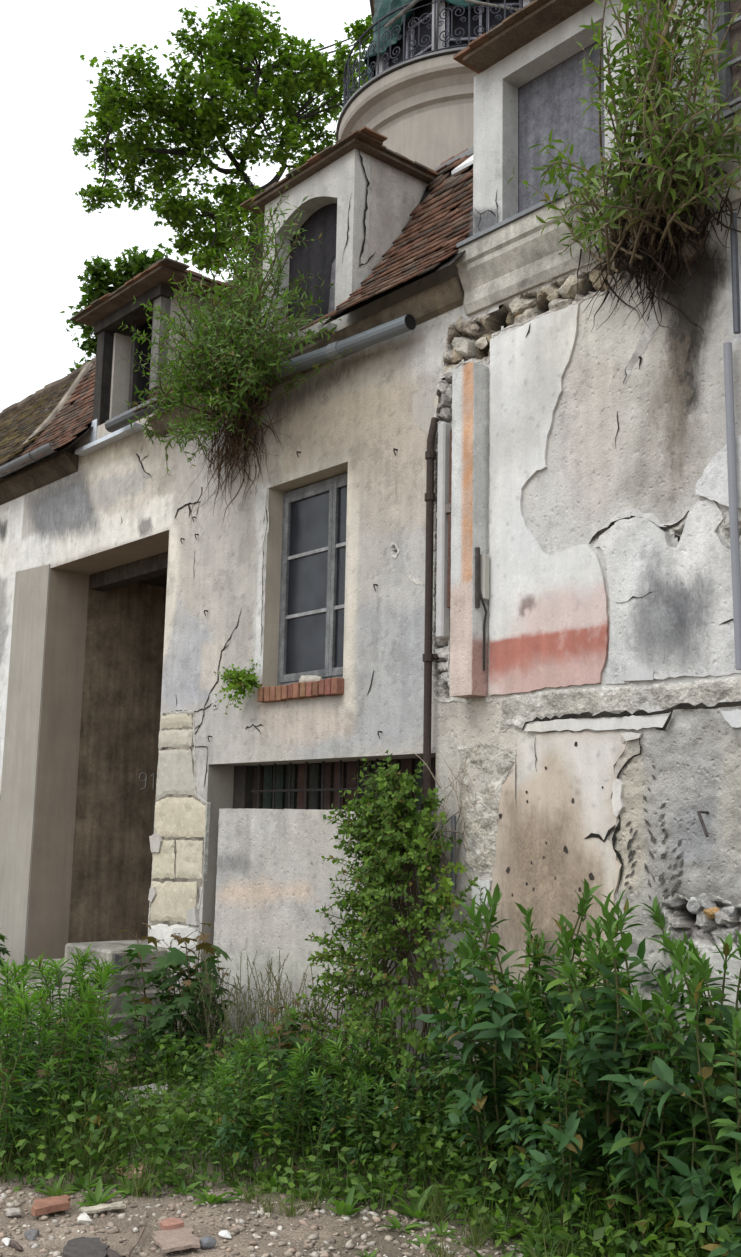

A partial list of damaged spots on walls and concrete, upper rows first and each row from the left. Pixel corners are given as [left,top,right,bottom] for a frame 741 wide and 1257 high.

crack [342,149,376,267]
crack [159,488,269,785]
flaking render [408,238,741,988]
leakage [634,562,707,661]
leakage [502,804,598,946]